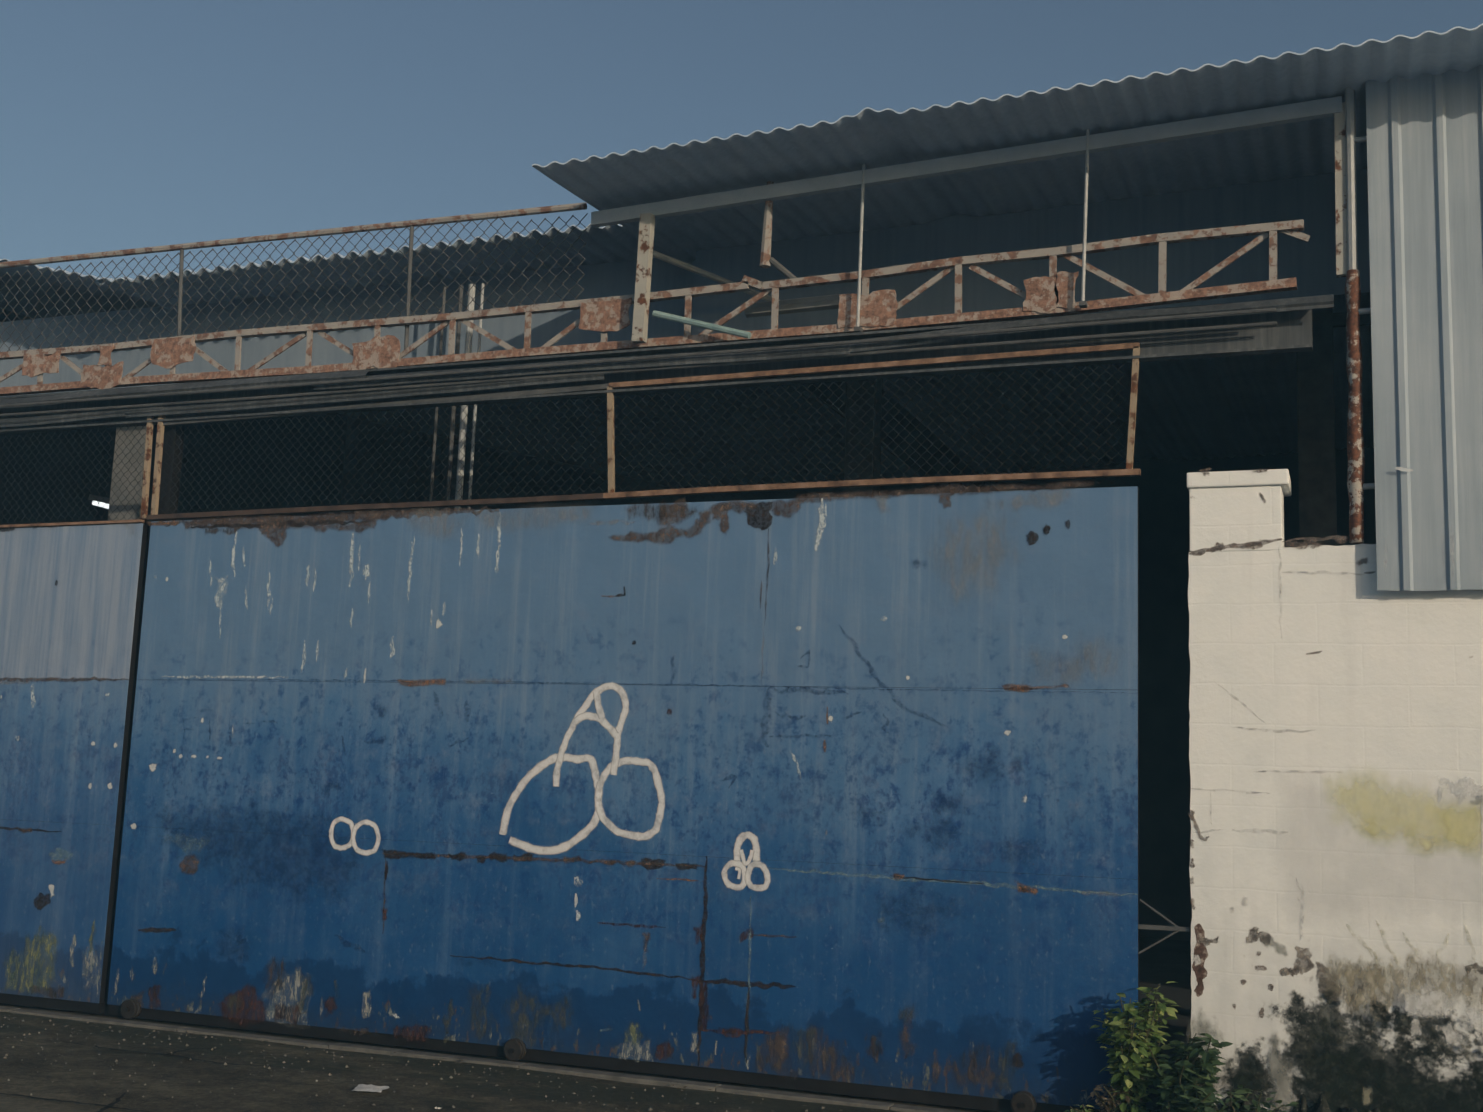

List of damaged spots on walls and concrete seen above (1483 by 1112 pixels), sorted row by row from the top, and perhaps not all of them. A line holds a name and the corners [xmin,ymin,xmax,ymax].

crack [1189,538,1282,556]
corrosion [656,856,781,1070]
peeling [1241,927,1341,1018]
water stain [1189,956,1483,1112]